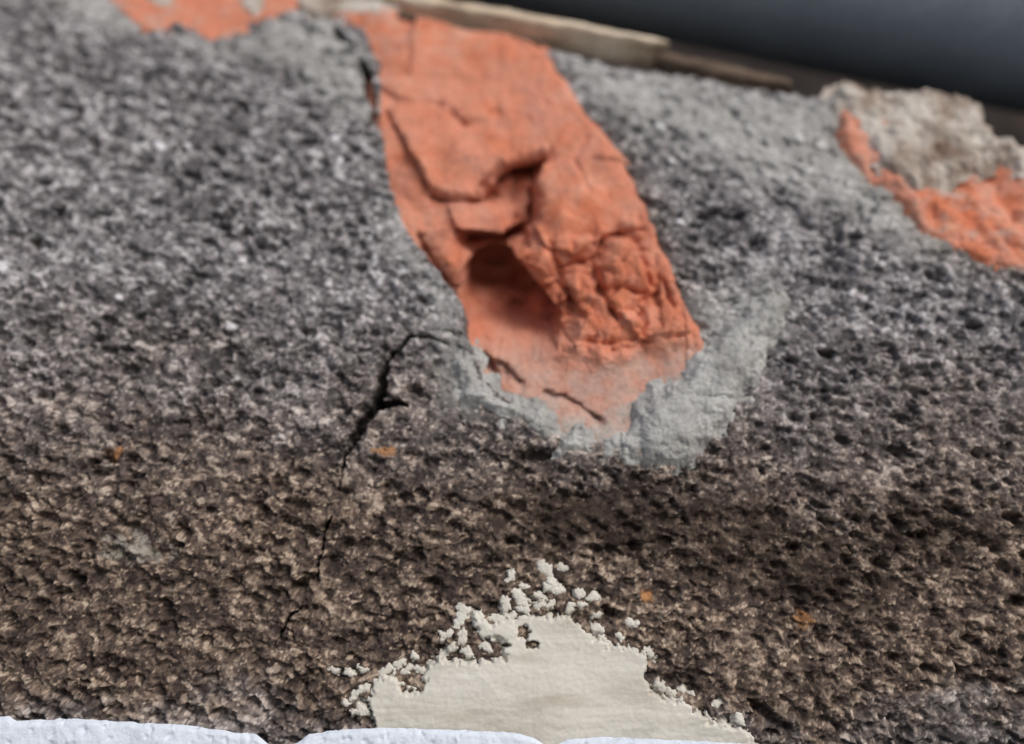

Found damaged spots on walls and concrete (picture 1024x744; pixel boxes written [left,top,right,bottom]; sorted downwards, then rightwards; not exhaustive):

spalling [112,0,791,476]
spalling [819,81,1024,272]
crack [341,335,446,472]
crack [315,518,332,578]
water stain [590,482,712,563]
crack [280,610,299,637]